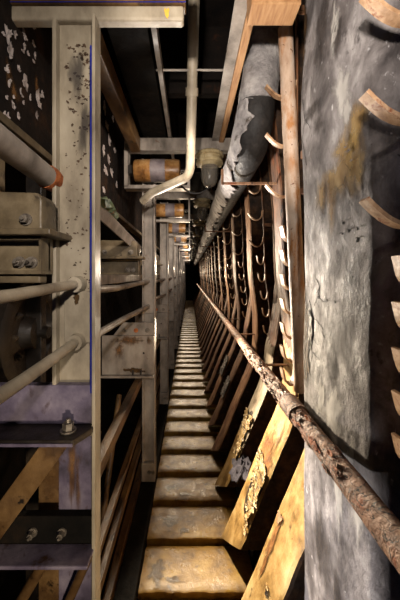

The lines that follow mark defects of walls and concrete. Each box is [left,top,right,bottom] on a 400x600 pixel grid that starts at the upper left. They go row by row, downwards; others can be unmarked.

peeling [1,24,44,120]
damp [319,74,365,222]
rust [116,337,150,355]
crack [308,279,330,369]
peeling [233,407,252,460]
peeling [243,447,267,538]
rust [261,431,282,472]
rust [259,510,283,576]